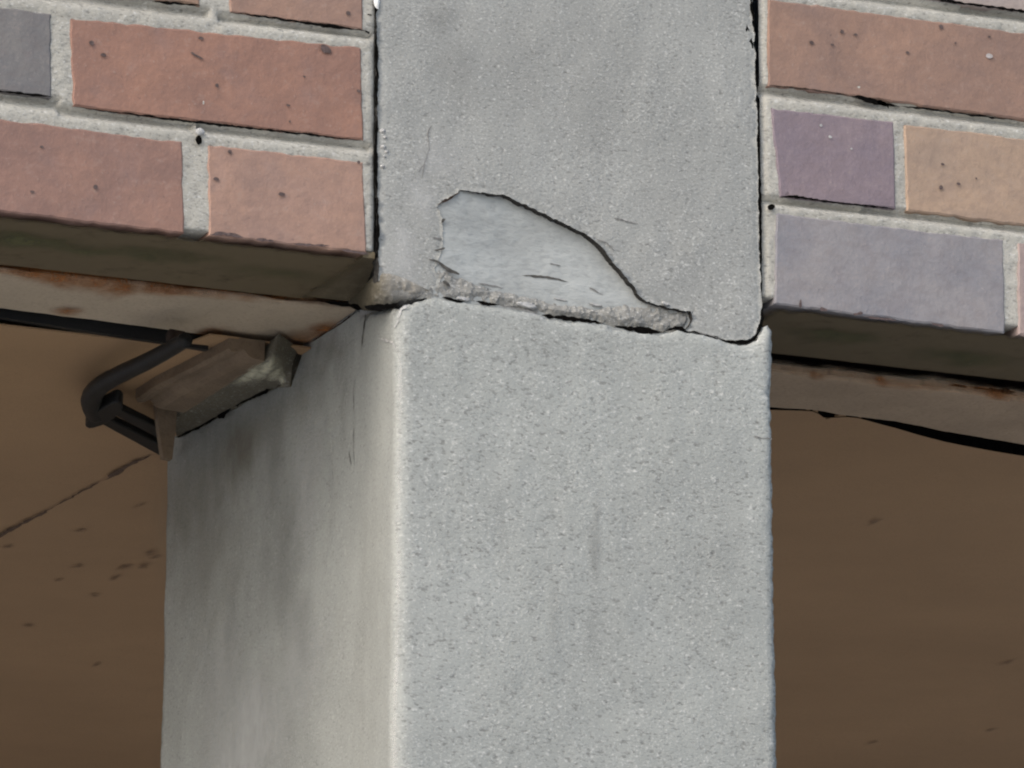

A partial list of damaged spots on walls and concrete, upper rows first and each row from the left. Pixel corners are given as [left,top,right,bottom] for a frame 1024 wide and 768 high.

crack [312,0,1024,344]
spalling [394,191,700,335]
crack [0,454,153,538]